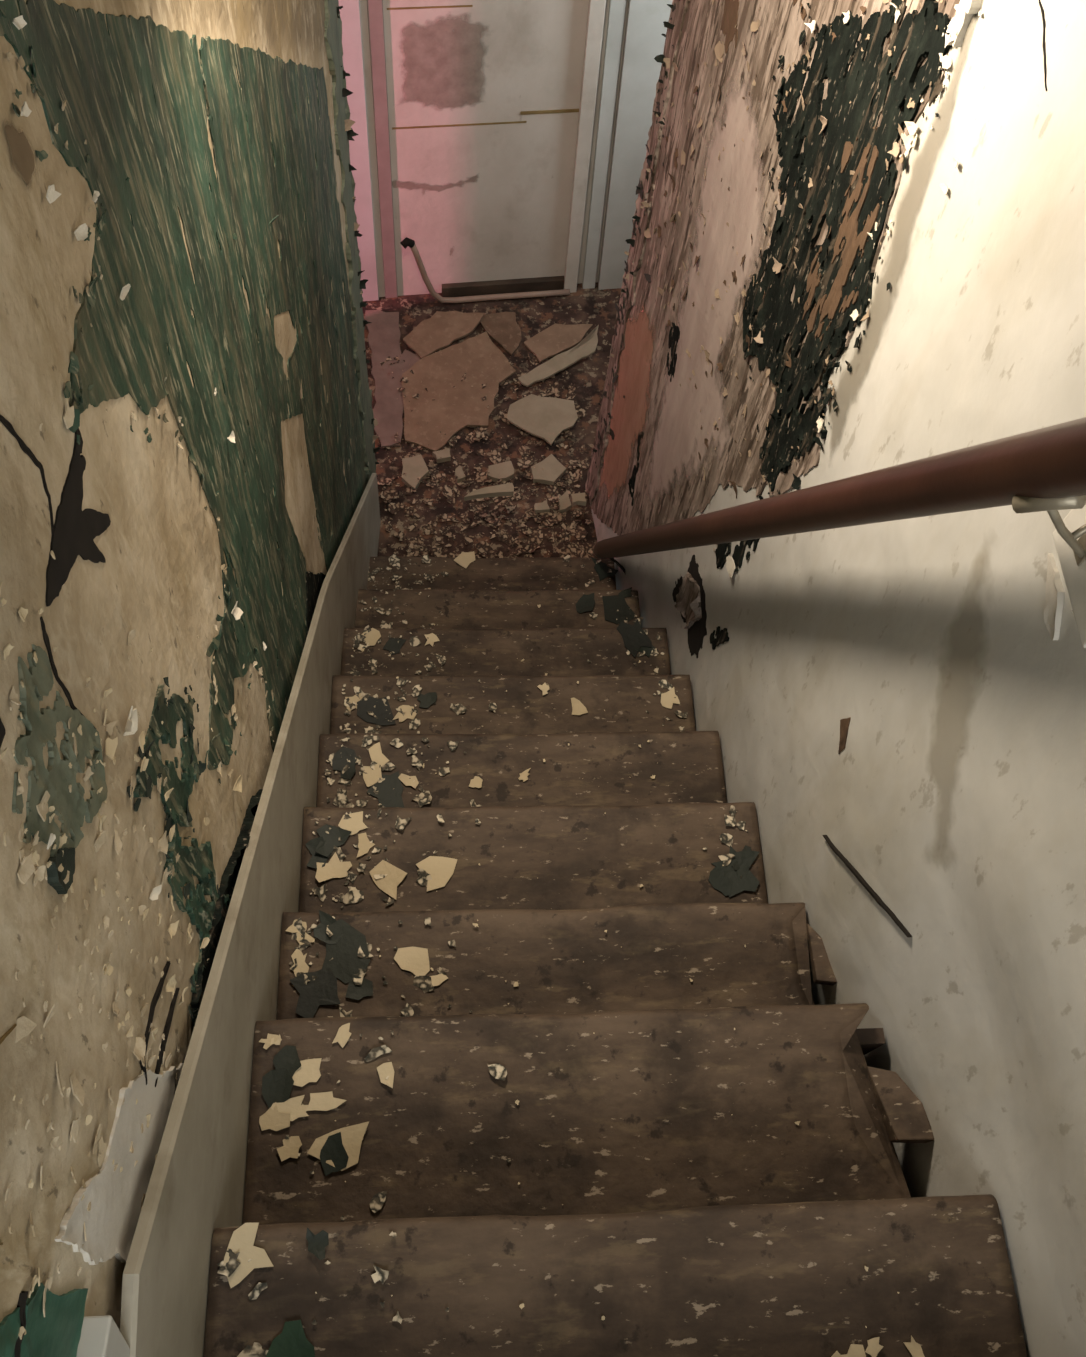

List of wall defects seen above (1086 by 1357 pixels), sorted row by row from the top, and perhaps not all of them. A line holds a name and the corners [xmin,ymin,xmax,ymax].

damp [402,15,485,108]
peeling [585,0,983,536]
damp [831,14,976,446]
crack [0,414,111,730]
spalling [672,555,729,658]
spalling [713,538,760,578]
peeling [0,0,380,1357]
crack [0,718,8,748]
peeling [289,554,466,985]
crack [823,835,912,937]
peeling [488,1063,507,1080]
peeling [371,1265,389,1284]